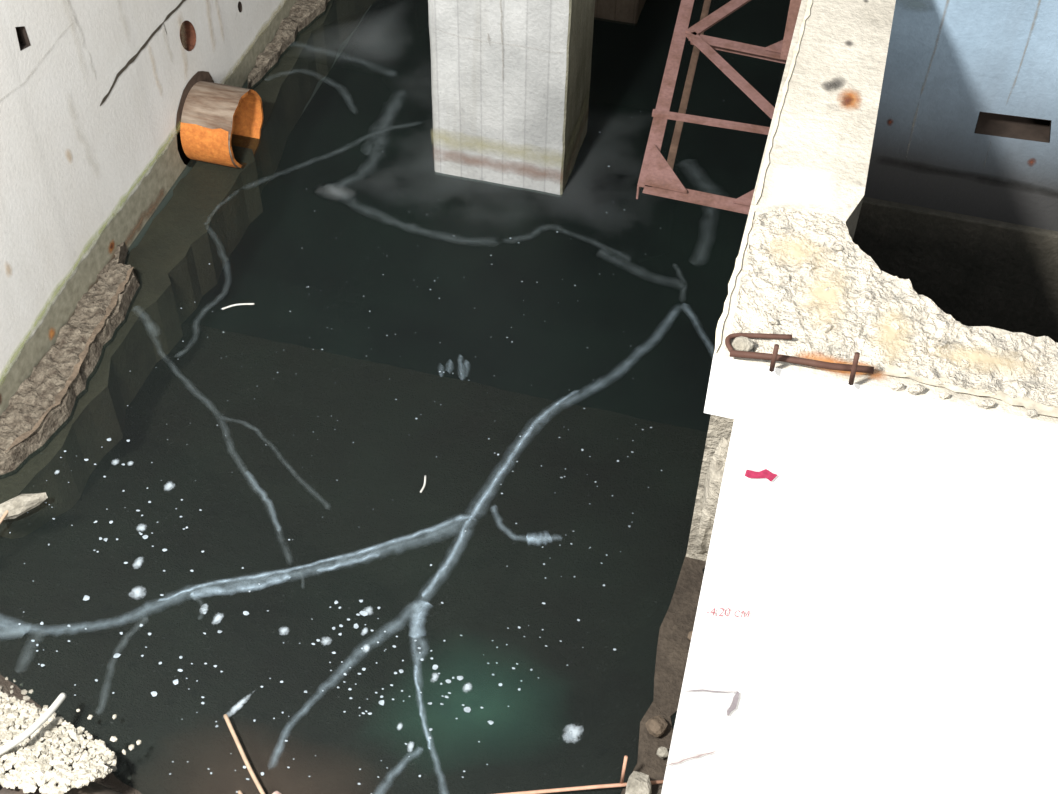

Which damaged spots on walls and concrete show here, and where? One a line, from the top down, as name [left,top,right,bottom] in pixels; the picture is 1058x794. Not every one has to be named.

crack [100,0,186,106]
spalling [715,0,1058,417]
rust [801,355,876,376]